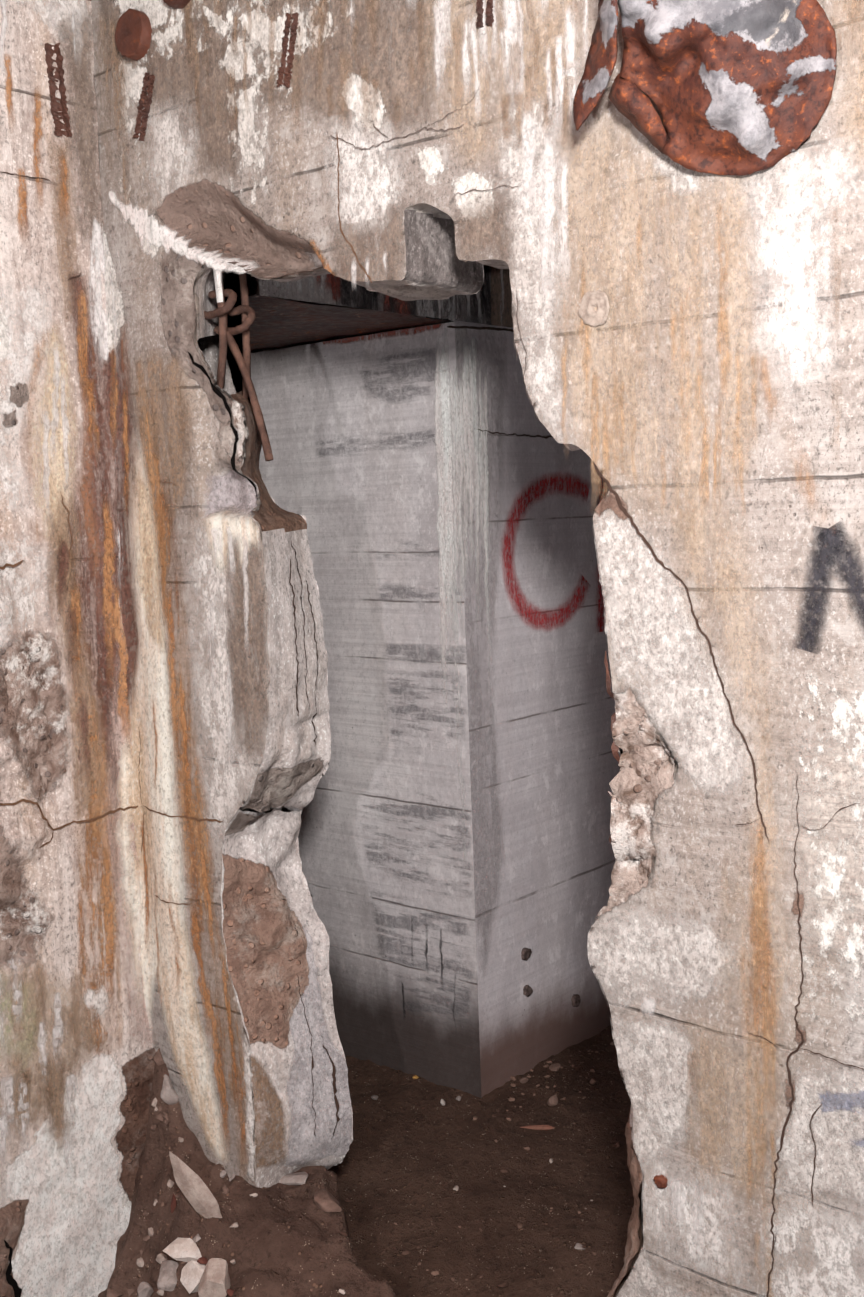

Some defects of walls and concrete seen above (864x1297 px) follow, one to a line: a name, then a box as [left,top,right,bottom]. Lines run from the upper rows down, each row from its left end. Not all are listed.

crack [188,352,257,496]
water stain [18,0,849,690]
water stain [0,542,45,645]
spalling [0,630,71,802]
crack [0,727,223,852]
rust [51,276,252,1156]
water stain [192,470,269,832]
spalling [112,0,509,1188]
spalling [596,689,676,918]
water stain [596,511,743,792]
crack [594,463,864,1297]
spalling [607,1097,644,1297]